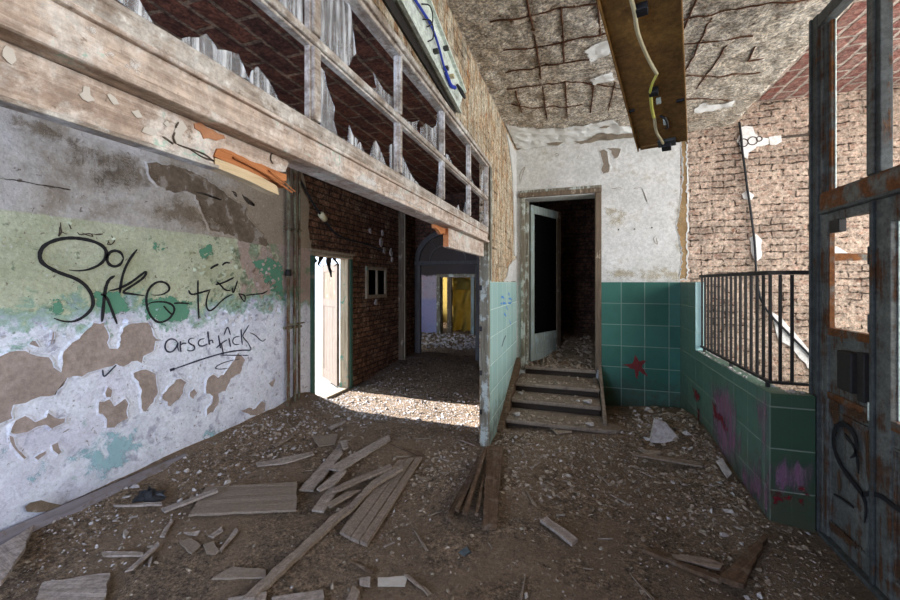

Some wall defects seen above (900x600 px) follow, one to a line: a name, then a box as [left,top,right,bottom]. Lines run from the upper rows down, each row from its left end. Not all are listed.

peeling [2,45,16,65]
peeling [78,86,94,102]
peeling [490,0,634,175]
peeling [145,160,281,332]
rust [835,253,867,261]
spalling [0,319,247,462]
spalling [240,399,267,417]